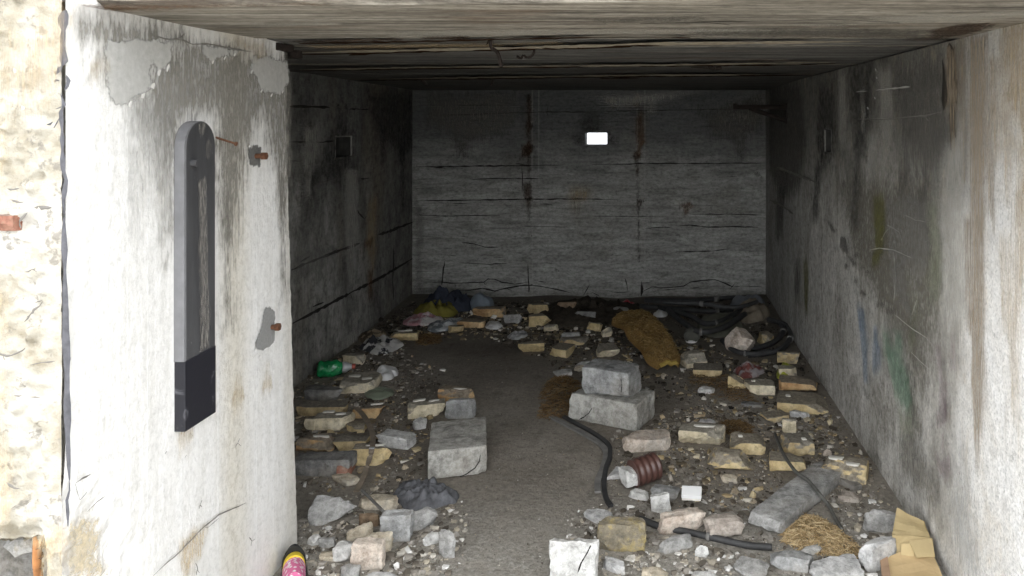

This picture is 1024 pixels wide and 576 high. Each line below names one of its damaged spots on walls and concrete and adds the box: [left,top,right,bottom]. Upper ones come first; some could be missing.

damp [80,17,158,43]
peeling [104,38,174,107]
peeling [250,55,289,97]
damp [132,31,291,352]
rust [521,94,533,220]
crack [291,162,760,324]
spalling [253,307,275,358]